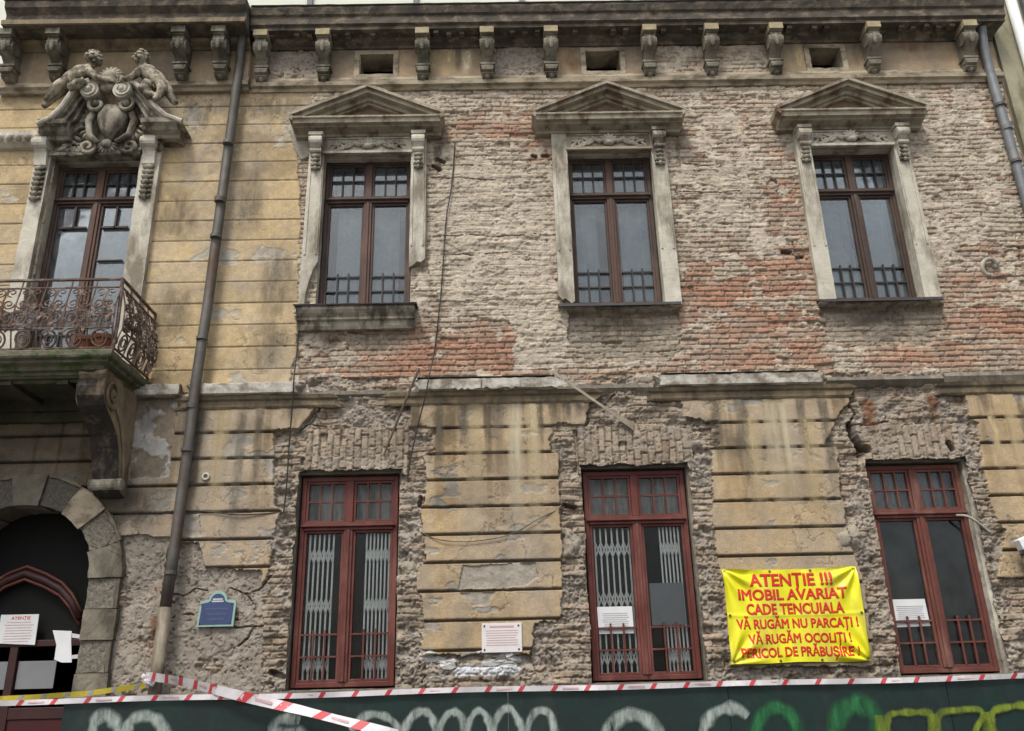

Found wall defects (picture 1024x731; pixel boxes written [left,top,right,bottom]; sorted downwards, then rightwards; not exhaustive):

flaking render [438,94,552,166]
damp [512,402,580,460]
crack [848,402,889,426]
spalling [109,241,1024,696]
crack [172,575,272,646]